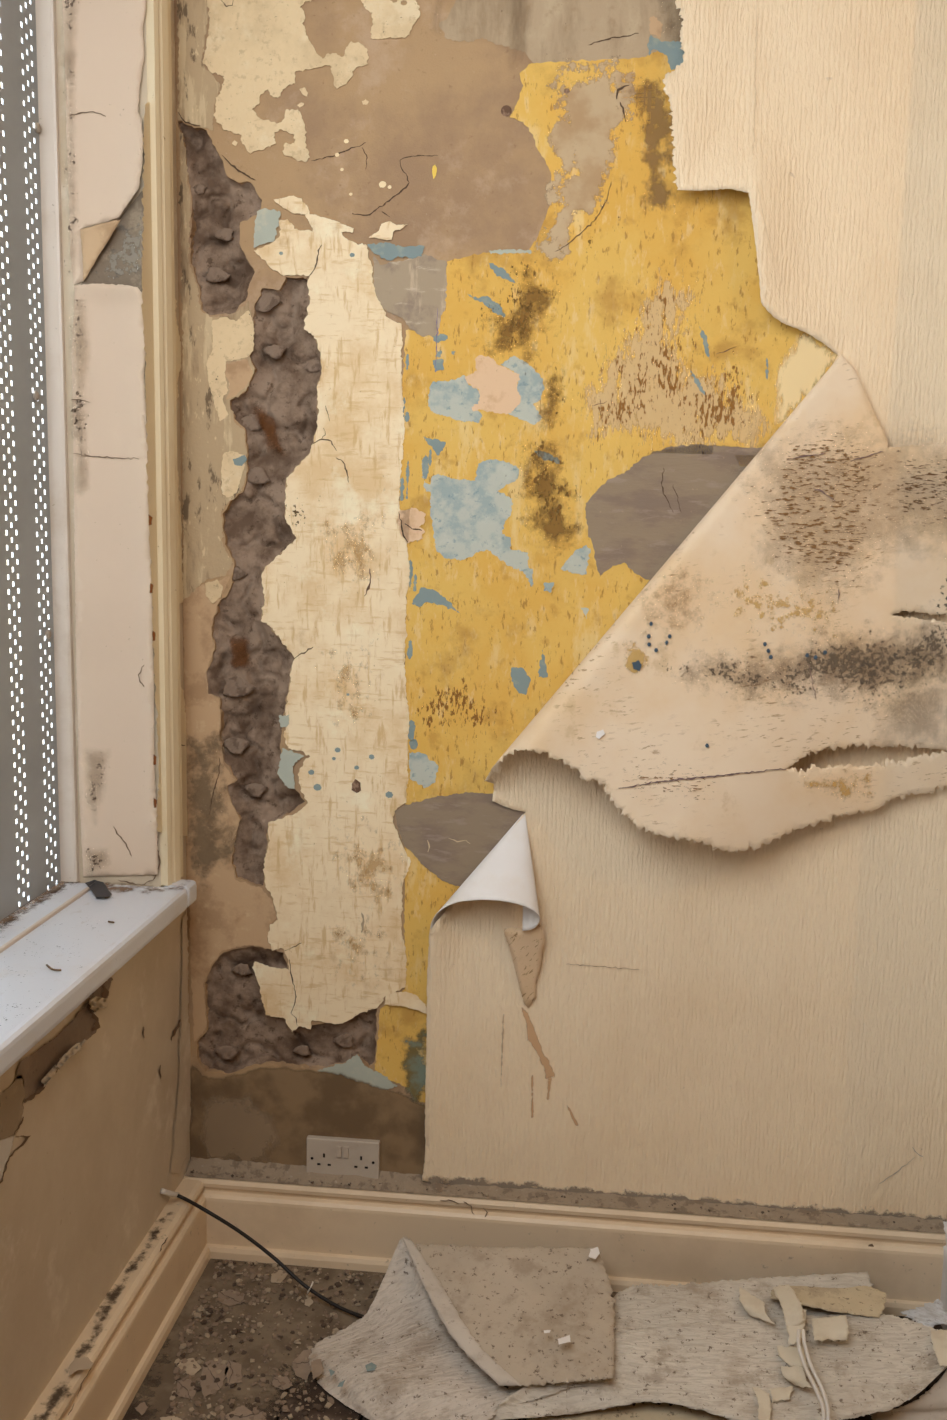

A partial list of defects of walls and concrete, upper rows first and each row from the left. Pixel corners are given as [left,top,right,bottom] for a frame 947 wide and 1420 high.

peeling [533,57,636,260]
peeling [81,102,162,833]
flaking render [179,0,420,885]
flaking render [465,355,521,414]
peeling [497,268,947,853]
leakage [705,427,947,705]
peeling [417,678,508,736]
peeling [0,977,113,1180]
flaking render [170,911,427,1173]
peeling [430,815,544,1007]